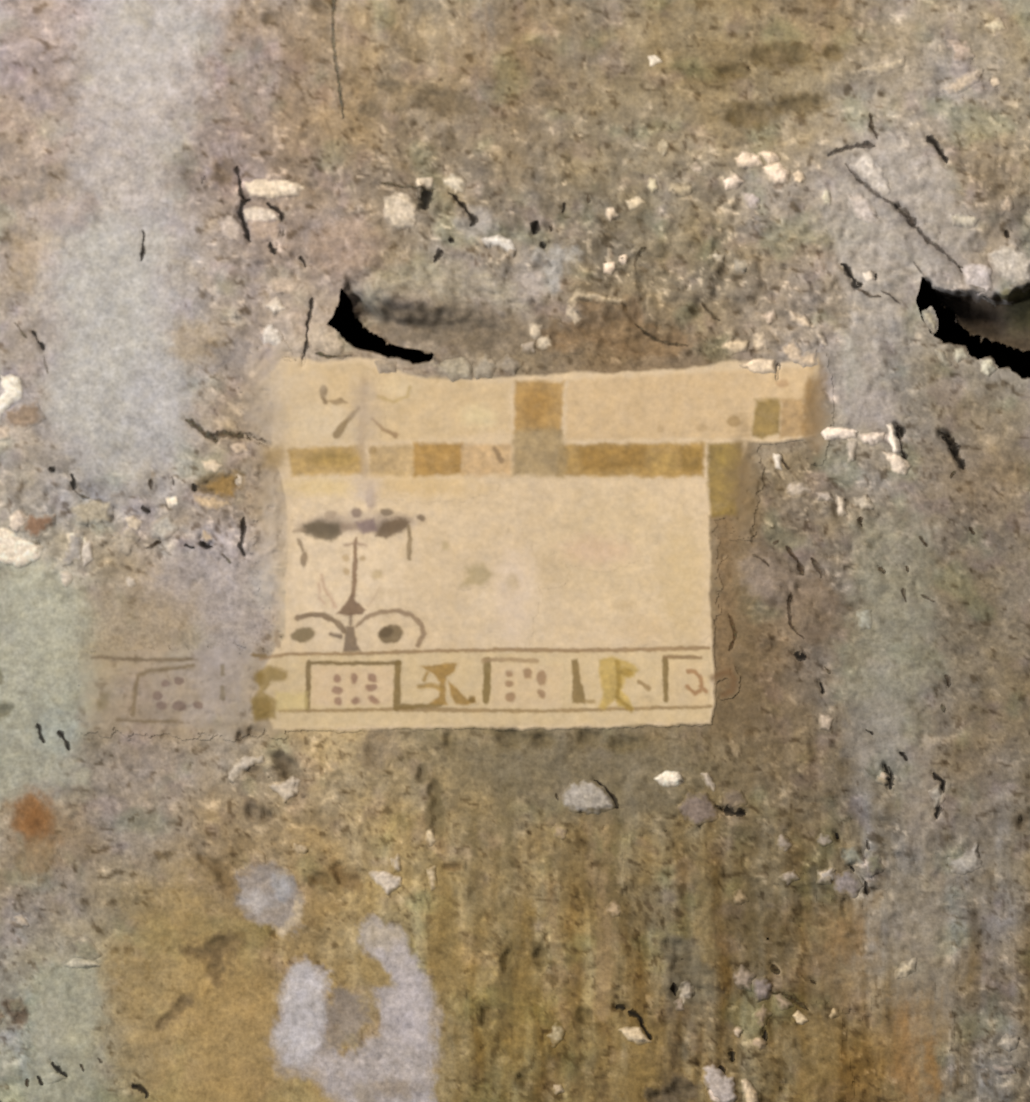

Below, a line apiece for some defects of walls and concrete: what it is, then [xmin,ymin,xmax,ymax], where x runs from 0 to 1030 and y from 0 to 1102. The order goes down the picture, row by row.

flaking render [847,151,891,223]
flaking render [949,212,980,229]
flaking render [1000,194,1014,215]
flaking render [262,274,306,346]
spalling [310,288,553,382]
flaking render [862,270,877,283]
spalling [916,244,1030,380]